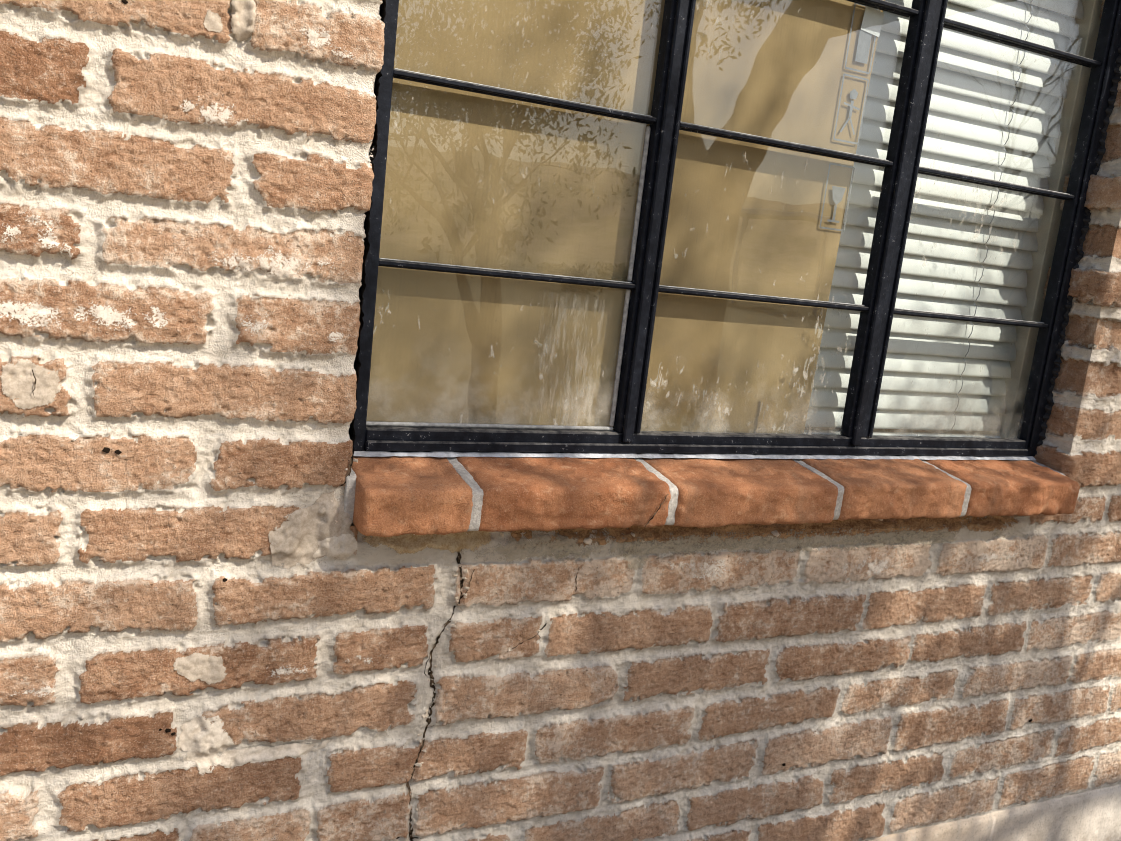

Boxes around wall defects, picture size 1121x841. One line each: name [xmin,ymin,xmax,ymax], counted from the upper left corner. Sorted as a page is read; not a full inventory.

leakage [2,212,74,258]
leakage [208,245,335,282]
leakage [0,300,169,334]
leakage [237,313,271,336]
crack [388,549,475,841]